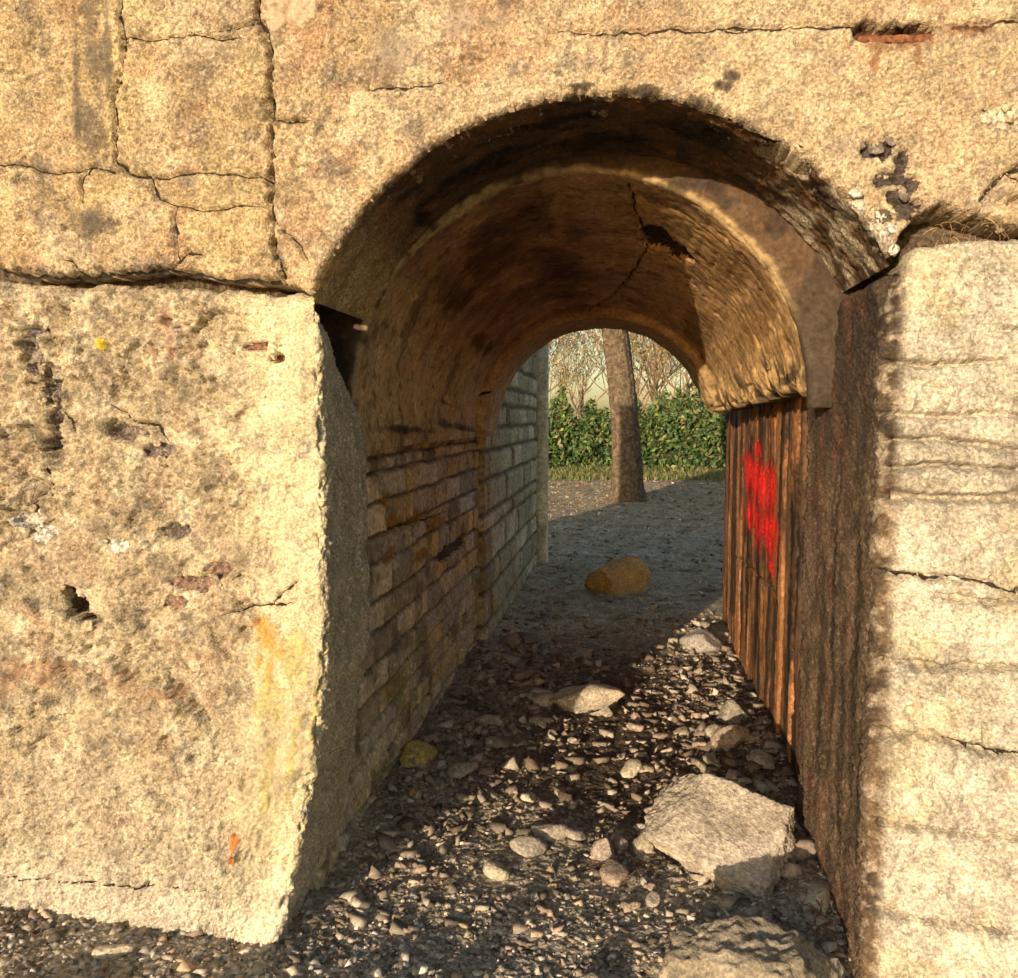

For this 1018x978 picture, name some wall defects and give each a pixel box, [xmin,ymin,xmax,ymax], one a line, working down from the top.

crack [0,0,310,286]
spalling [845,135,1005,257]
crack [979,168,1018,201]
crack [589,183,697,313]
spalling [60,585,97,633]
crack [221,581,299,616]
rust [255,618,277,677]